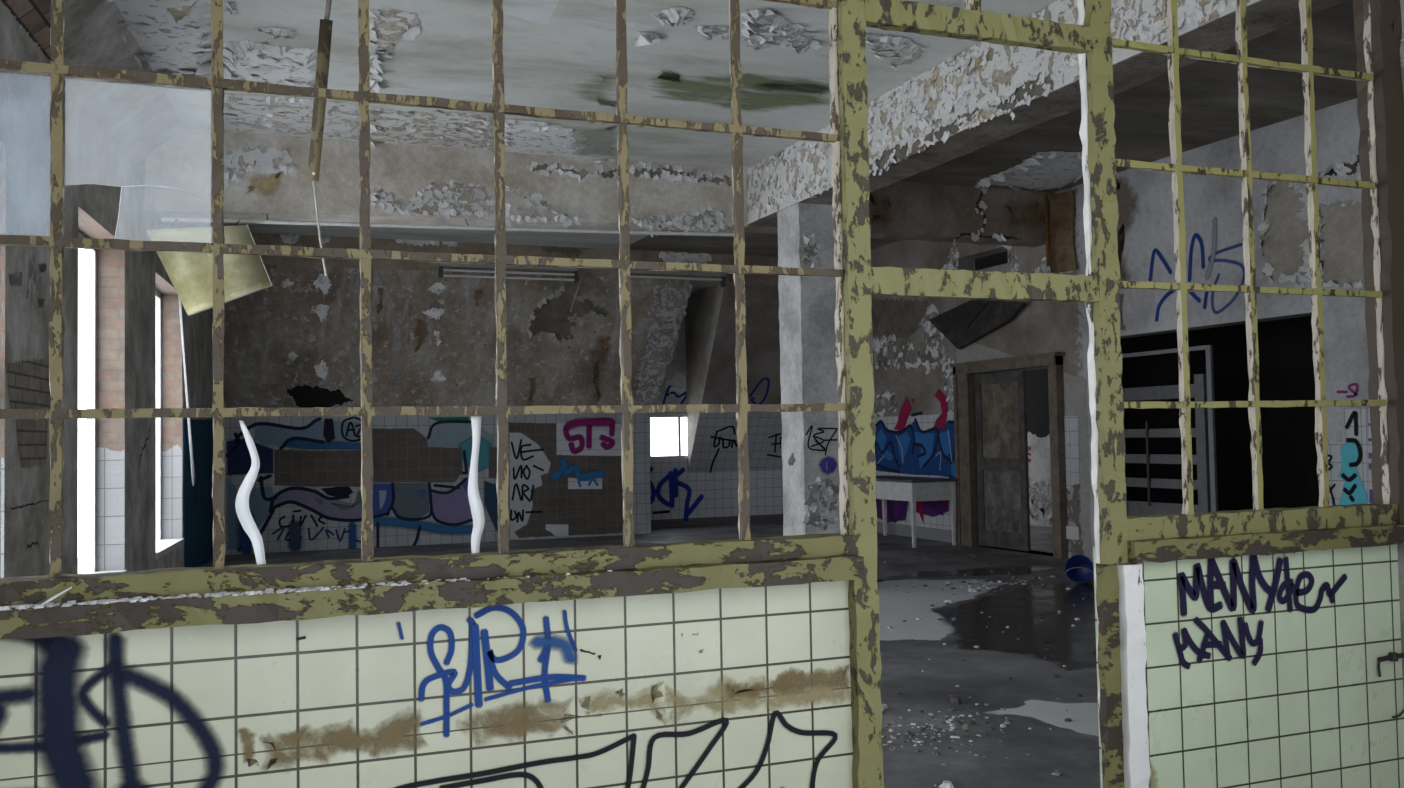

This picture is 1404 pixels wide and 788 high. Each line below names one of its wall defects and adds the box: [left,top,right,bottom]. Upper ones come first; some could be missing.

peeling [634,7,822,55]
peeling [1110,0,1236,51]
peeling [1394,0,1404,68]
peeling [104,0,732,190]
mould [657,73,828,111]
peeling [865,33,1053,176]
peeling [370,179,583,228]
peeling [750,142,833,214]
peeling [974,151,1083,192]
peeling [1257,181,1364,289]
flaking render [526,286,611,344]
peeling [871,297,954,418]